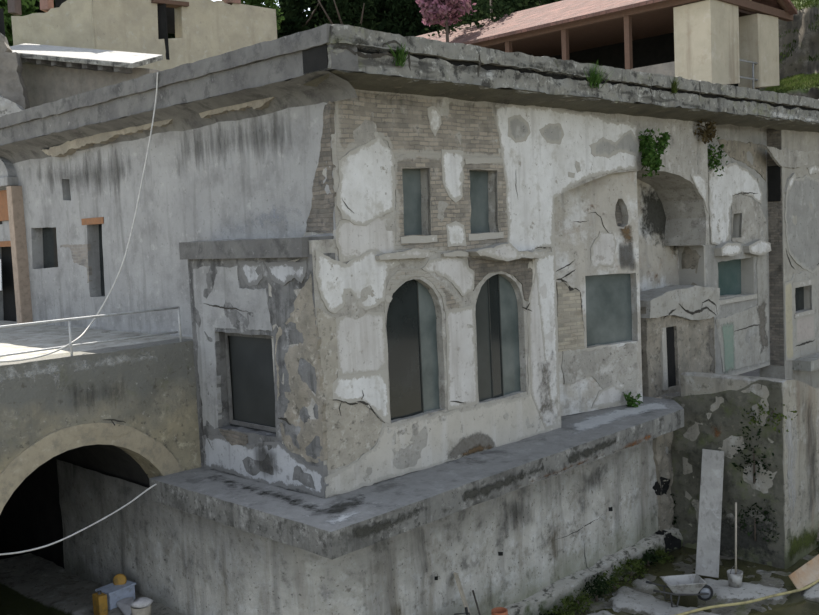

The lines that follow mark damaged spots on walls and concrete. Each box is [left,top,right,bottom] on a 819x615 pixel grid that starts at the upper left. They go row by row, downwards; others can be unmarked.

crack [336,40,411,71]
peeling [690,139,819,278]
peeling [193,101,639,497]
crack [334,391,385,423]
leakage [569,438,616,463]
leakage [464,468,542,501]
leakage [244,486,362,522]
leakage [354,509,417,538]